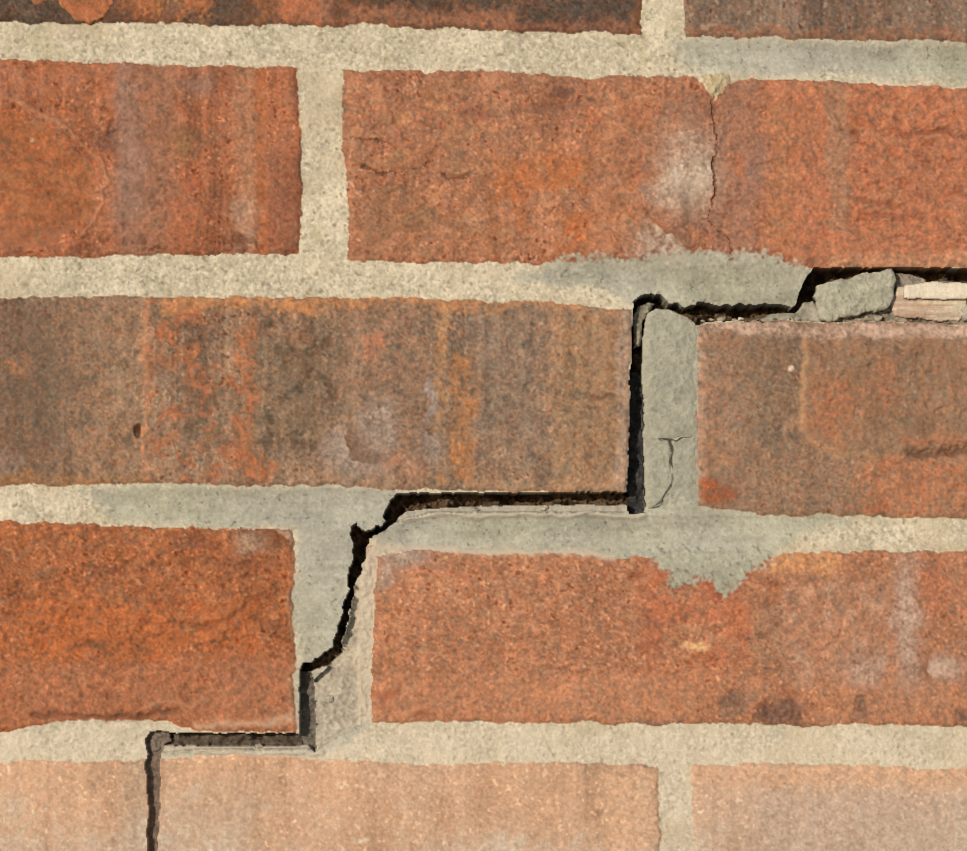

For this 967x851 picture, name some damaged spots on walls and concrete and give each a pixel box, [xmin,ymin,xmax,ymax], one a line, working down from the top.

peeling [30,0,114,25]
peeling [132,0,218,26]
crack [707,95,733,254]
crack [144,267,967,851]